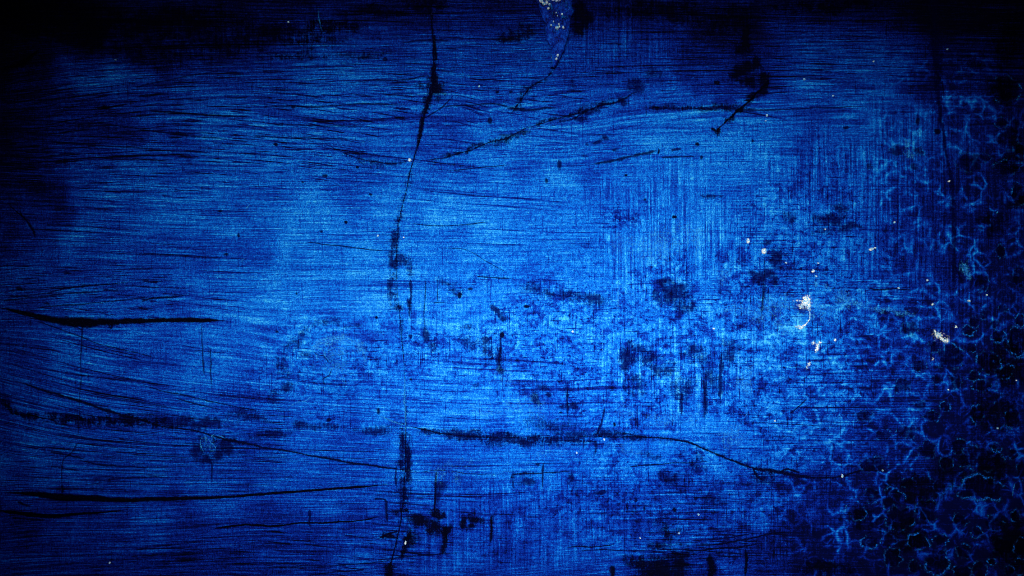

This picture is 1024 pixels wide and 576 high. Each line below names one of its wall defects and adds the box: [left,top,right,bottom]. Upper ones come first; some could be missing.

crack [711,81,768,131]
crack [5,0,539,575]
crack [579,434,866,480]